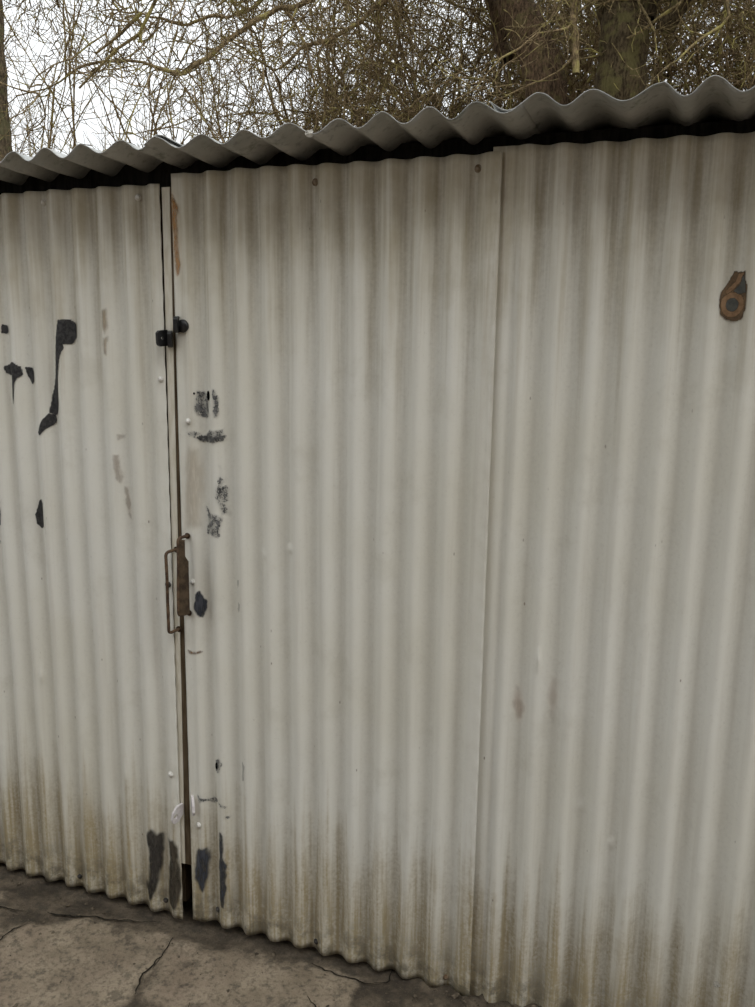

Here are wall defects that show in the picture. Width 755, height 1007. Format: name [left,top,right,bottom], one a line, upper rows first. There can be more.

peeling [4,362,34,396]
peeling [195,390,219,417]
peeling [189,430,225,443]
peeling [35,500,44,528]
peeling [207,477,228,537]
peeling [195,833,227,908]
crack [0,906,173,994]
crack [312,963,393,985]